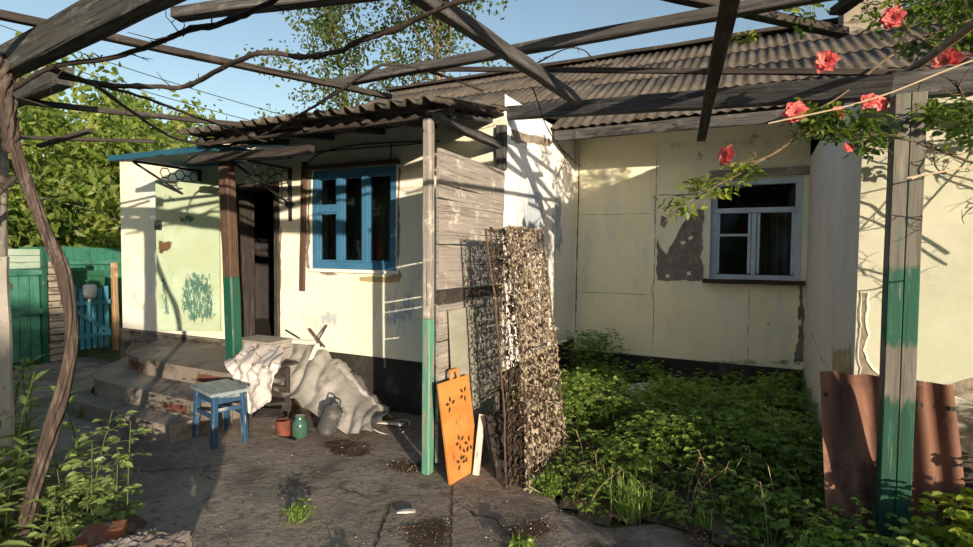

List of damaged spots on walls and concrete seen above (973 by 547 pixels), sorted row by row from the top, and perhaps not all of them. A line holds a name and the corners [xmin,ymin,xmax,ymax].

spalling [510,127,554,148]
spalling [655,205,706,283]
spalling [832,291,879,376]
spalling [945,373,973,409]